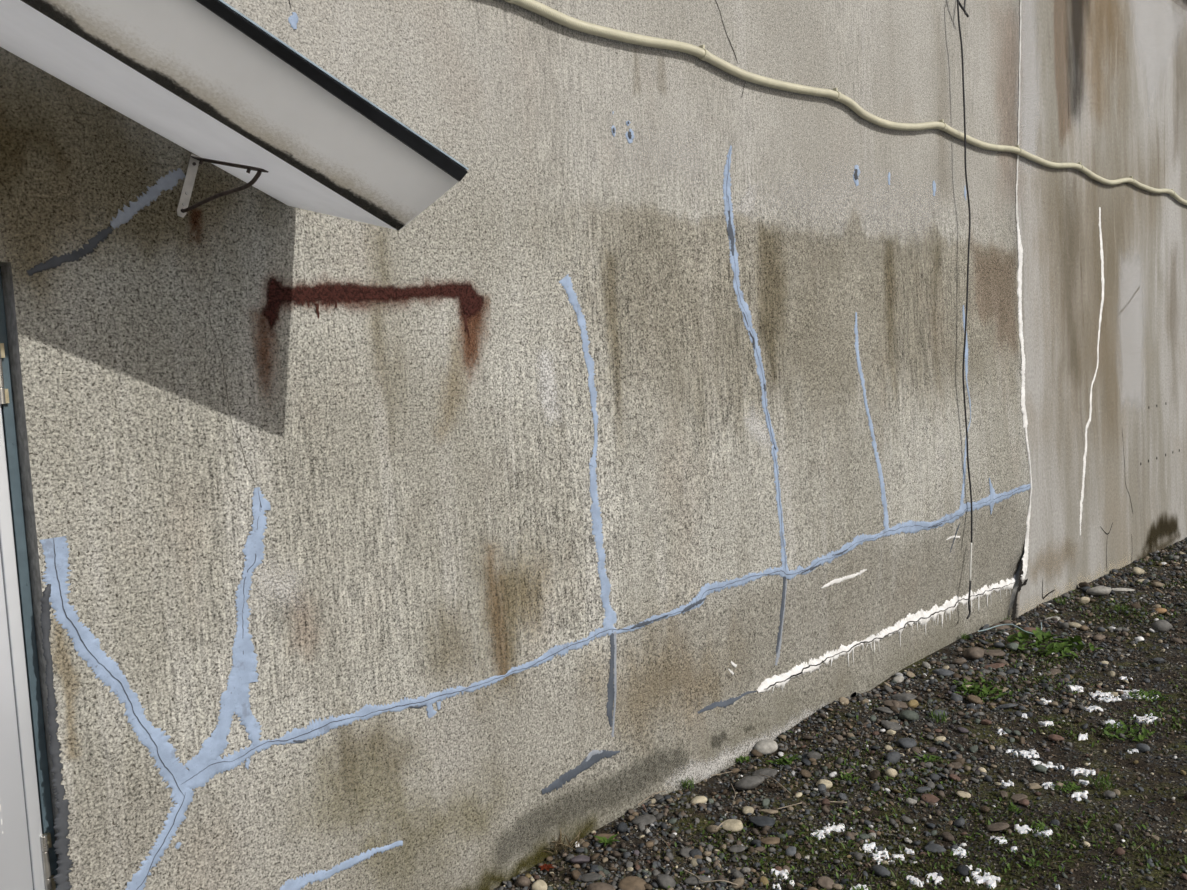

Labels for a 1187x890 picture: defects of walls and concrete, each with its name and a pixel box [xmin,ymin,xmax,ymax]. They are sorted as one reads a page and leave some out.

crack [715,0,745,98]
damp [1020,0,1037,162]
damp [1070,0,1088,113]
damp [1131,0,1183,98]
corrosion [261,279,484,368]
crack [1080,207,1140,566]
damp [1119,259,1143,404]
crack [27,145,1031,890]
damp [1146,517,1177,548]